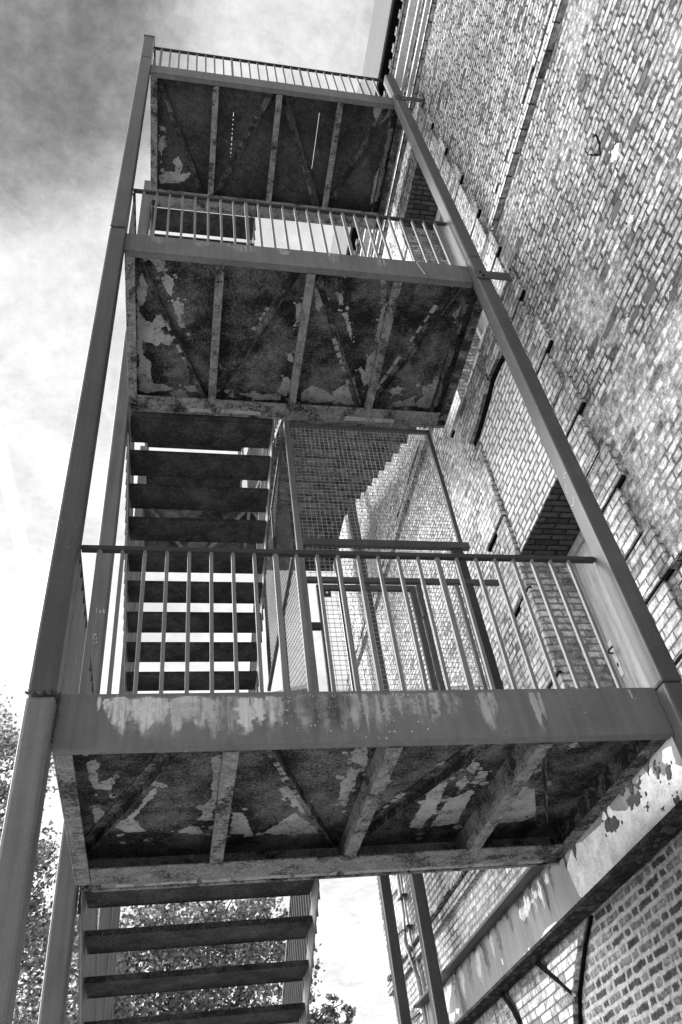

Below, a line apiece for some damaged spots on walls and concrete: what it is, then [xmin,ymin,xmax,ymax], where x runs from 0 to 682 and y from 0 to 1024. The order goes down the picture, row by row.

peeling [158,126,190,189]
peeling [136,258,470,423]
peeling [83,755,120,824]
peeling [115,781,167,844]
peeling [171,755,222,834]
peeling [226,762,318,838]
peeling [333,747,368,813]
peeling [409,758,492,840]
peeling [499,768,552,823]
peeling [563,746,682,897]